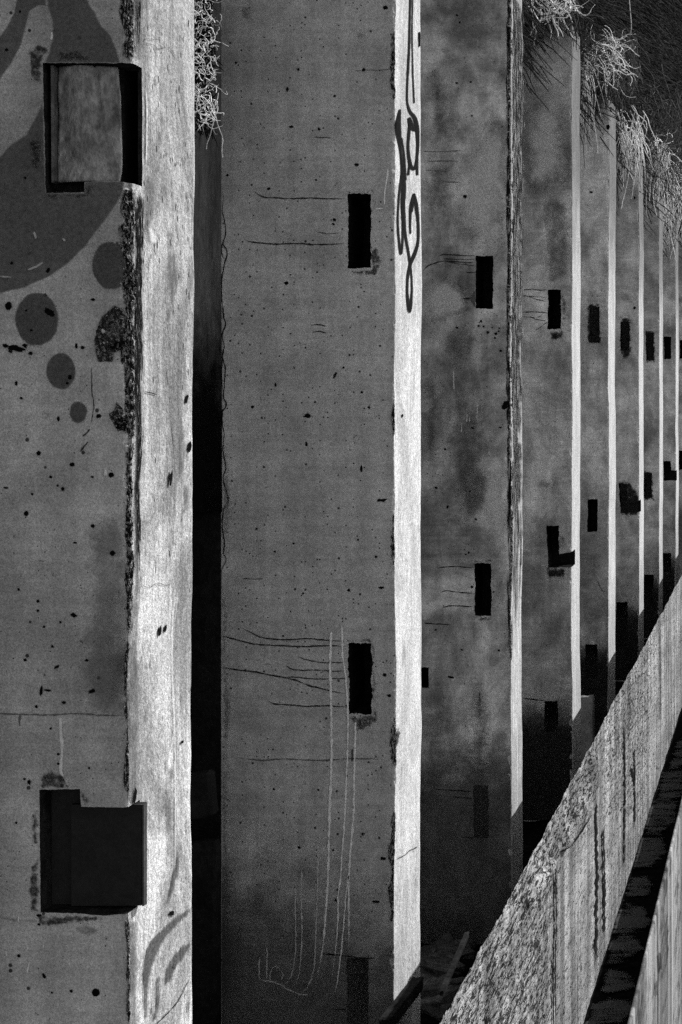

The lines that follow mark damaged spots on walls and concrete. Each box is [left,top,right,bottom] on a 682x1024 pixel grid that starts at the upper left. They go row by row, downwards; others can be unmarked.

spalling [119,0,142,58]
spalling [29,45,87,81]
crack [255,191,340,199]
crack [221,205,342,582]
spalling [75,188,155,804]
crack [222,629,345,707]
spalling [23,753,67,787]
spalling [29,864,97,926]